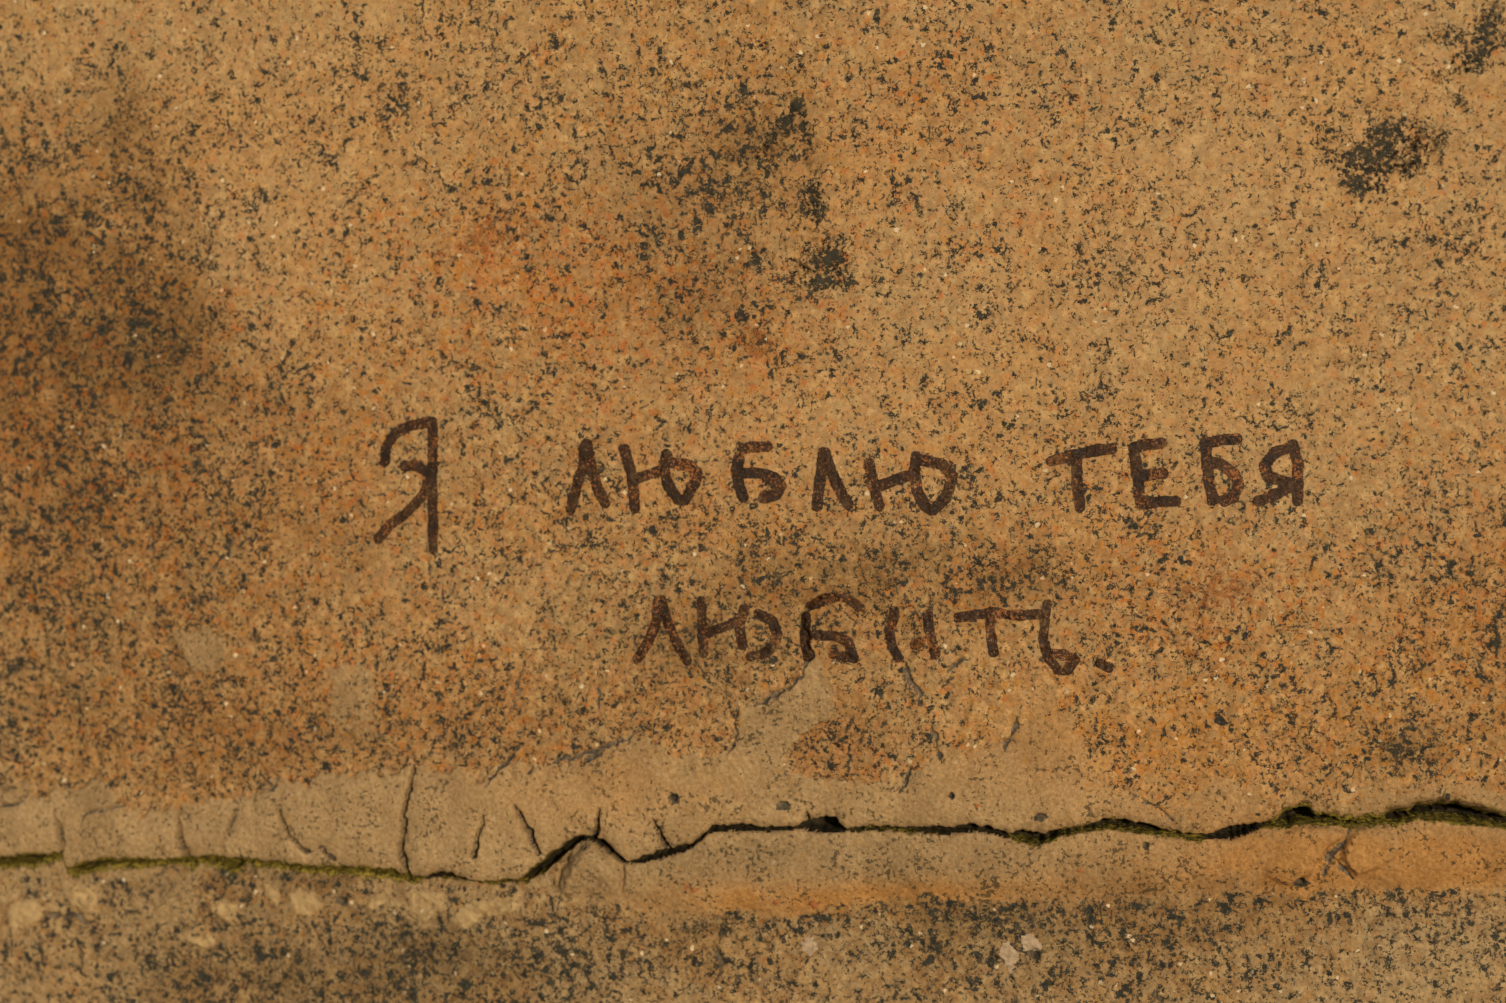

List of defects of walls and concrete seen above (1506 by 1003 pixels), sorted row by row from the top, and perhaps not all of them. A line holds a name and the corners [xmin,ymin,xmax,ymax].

crack [400,658,1506,882]
crack [0,796,244,869]
crack [265,773,336,866]